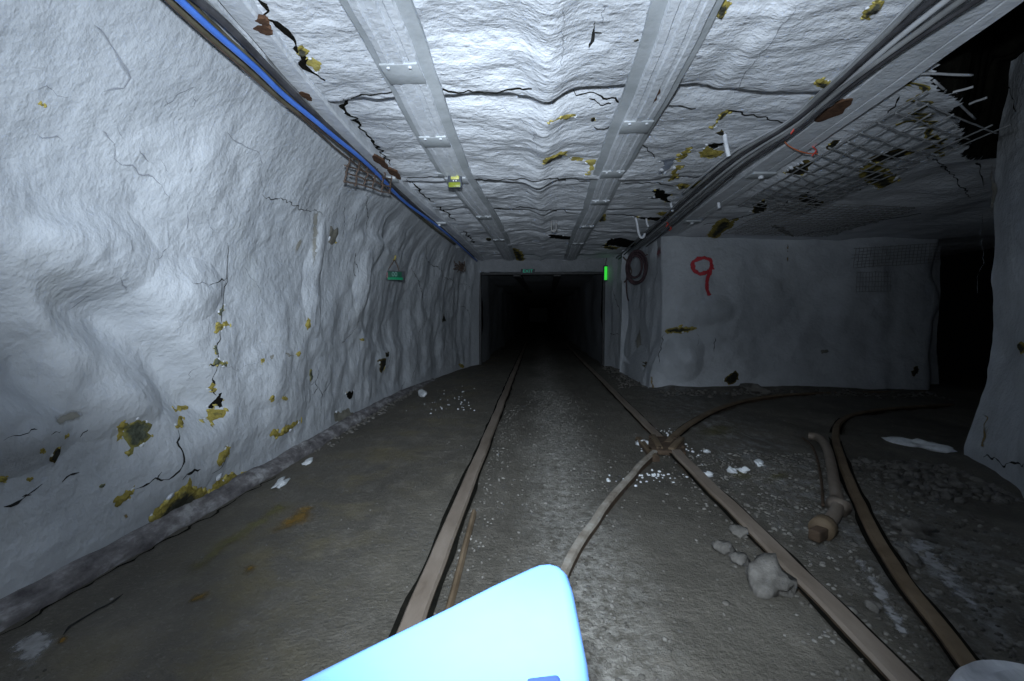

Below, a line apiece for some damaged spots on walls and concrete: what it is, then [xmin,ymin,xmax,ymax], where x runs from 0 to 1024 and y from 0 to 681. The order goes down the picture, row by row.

rust [253,14,273,36]
crack [442,88,537,150]
crack [573,90,619,130]
rust [814,98,853,122]
spalling [542,151,596,177]
spalling [783,160,814,176]
spalling [858,149,910,190]
spalling [199,382,229,427]
crack [134,430,226,490]
crack [4,472,80,507]
spalling [113,485,135,507]
spalling [148,445,246,523]